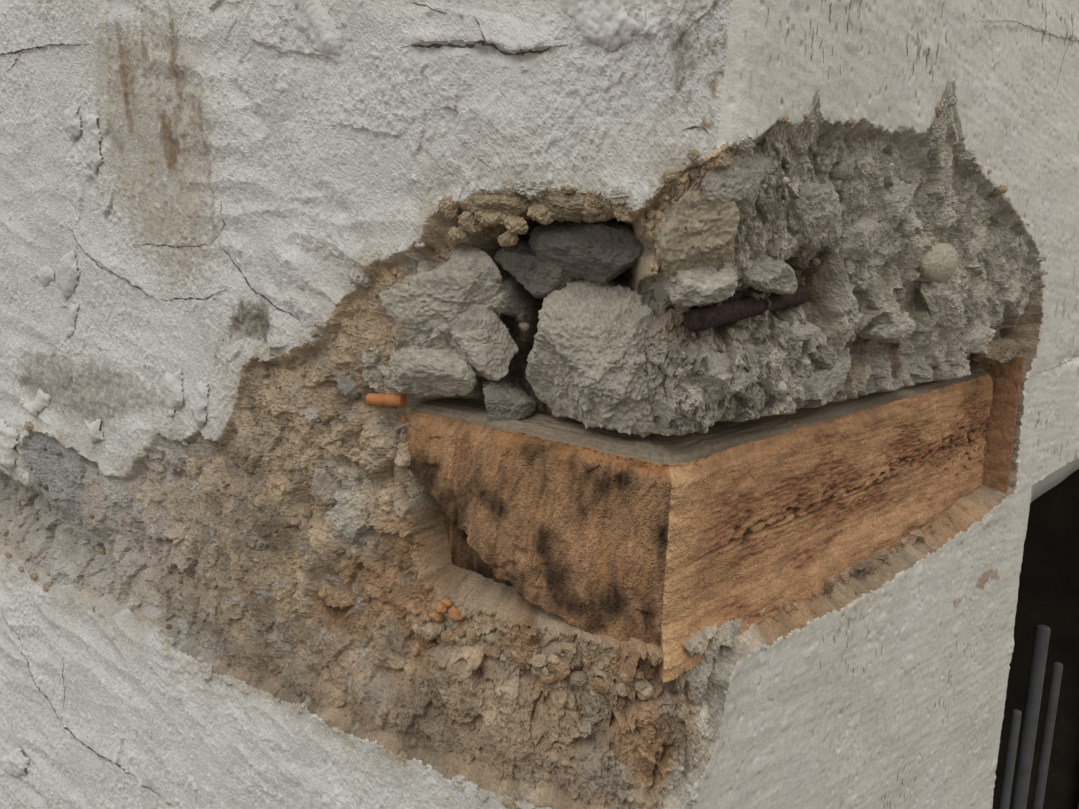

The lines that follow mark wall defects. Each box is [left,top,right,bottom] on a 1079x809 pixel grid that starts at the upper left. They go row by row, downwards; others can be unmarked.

crack [0,43,88,71]
crack [400,16,566,56]
peeling [805,0,862,78]
peeling [907,34,947,83]
crack [975,20,1079,83]
flaking render [953,104,966,142]
spalling [526,185,617,225]
spalling [517,218,543,242]
spalling [684,285,810,332]
spalling [982,355,1024,493]
spalling [374,706,390,727]
spalling [543,765,552,782]